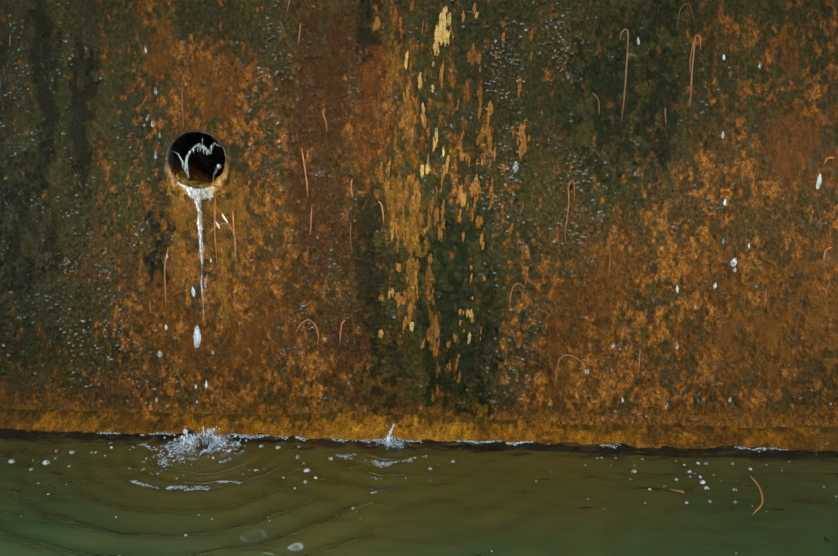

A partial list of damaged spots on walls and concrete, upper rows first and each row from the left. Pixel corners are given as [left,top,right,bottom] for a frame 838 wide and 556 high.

water stain [26,0,61,191]
water stain [68,43,98,203]
rust [384,21,435,308]
rust [128,171,298,391]
rust [426,293,439,365]
water stain [422,285,496,413]